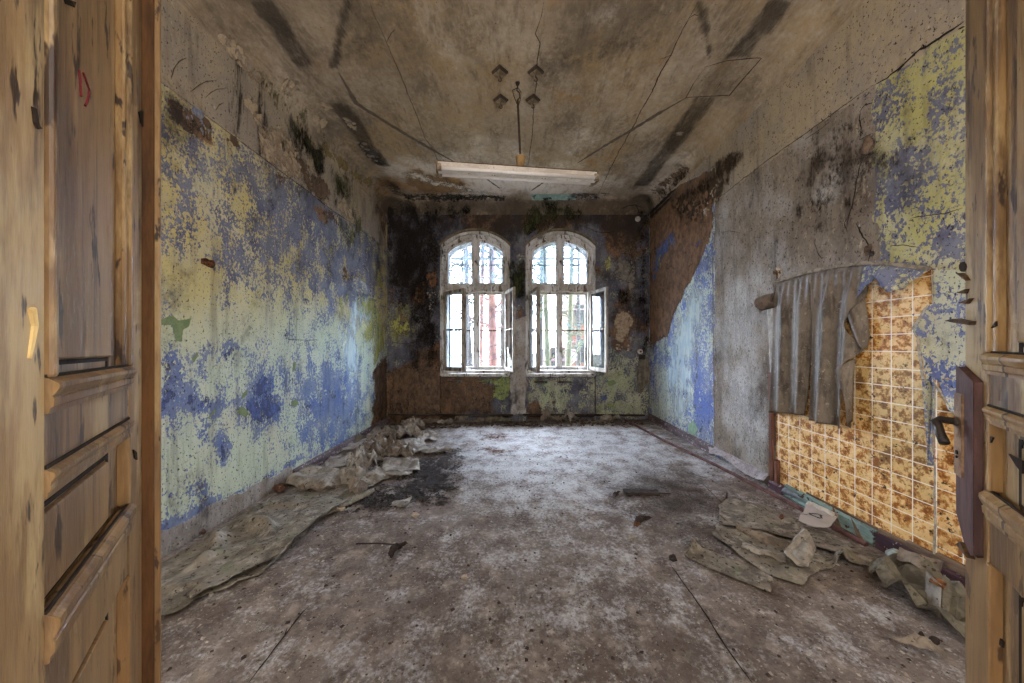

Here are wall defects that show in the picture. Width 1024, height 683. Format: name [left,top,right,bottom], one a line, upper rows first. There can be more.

peeling [161,315,191,342]
peeling [238,375,298,424]
flaking render [244,96,356,226]
flaking render [372,340,442,423]
crack [370,4,458,213]
damp [340,168,497,383]
crack [528,3,544,164]
damp [524,199,582,239]
crack [600,3,698,190]
flaking render [614,184,718,394]
damp [796,124,899,232]
spalling [806,492,965,577]